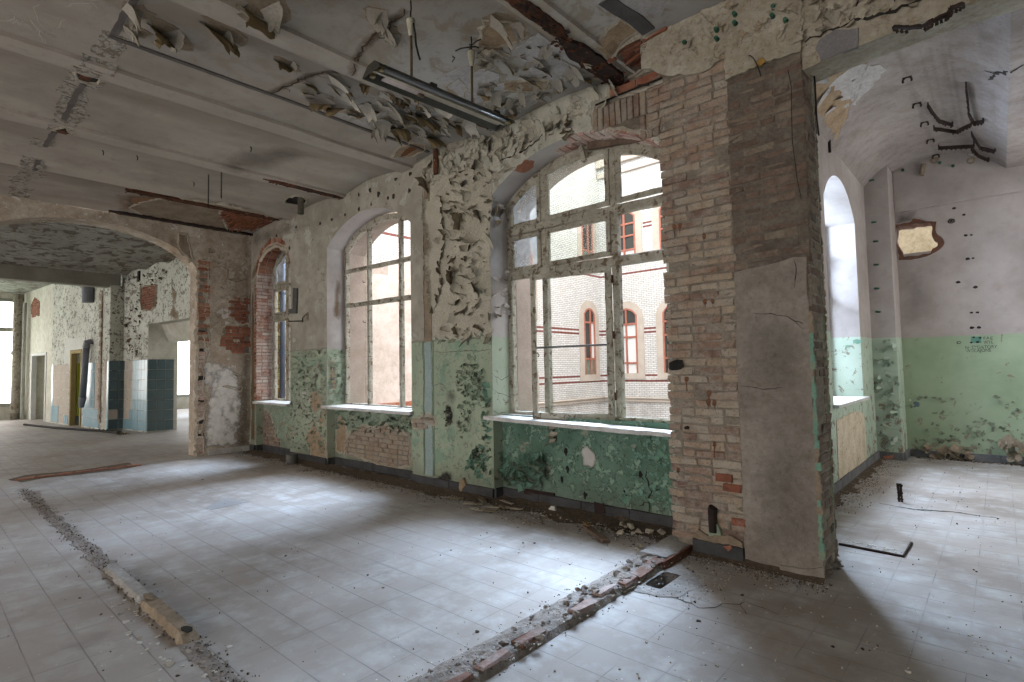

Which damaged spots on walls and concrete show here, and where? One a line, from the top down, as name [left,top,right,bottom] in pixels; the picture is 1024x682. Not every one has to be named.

peeling [121,1,194,54]
peeling [200,0,291,57]
crack [805,0,921,42]
flaking render [816,61,871,141]
peeling [274,6,667,492]
spalling [895,217,946,262]
flaking render [120,197,438,469]
flaking render [836,340,1024,480]
peeling [620,436,675,508]
crack [673,597,774,613]